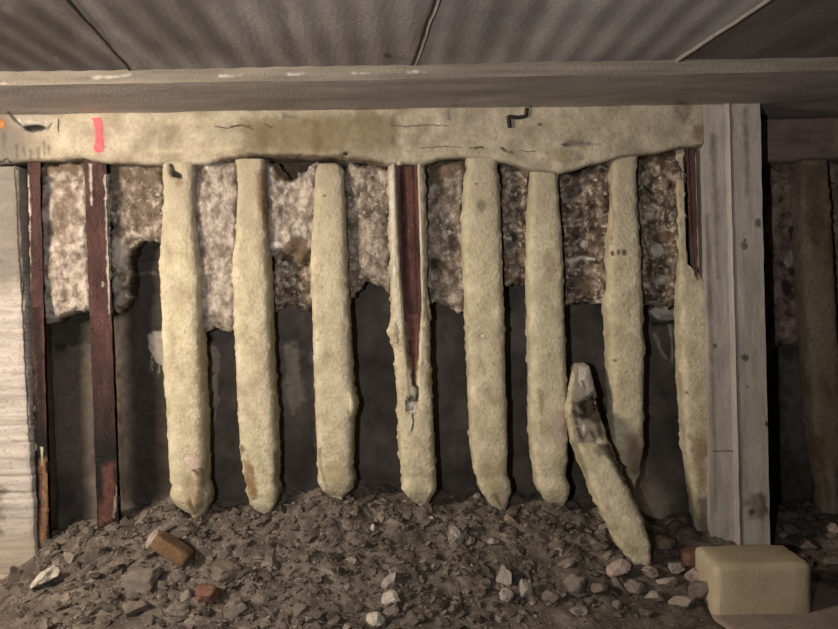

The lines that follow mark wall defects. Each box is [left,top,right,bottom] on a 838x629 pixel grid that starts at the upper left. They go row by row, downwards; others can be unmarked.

crack [0,158,30,443]
spalling [41,162,92,324]
spalling [102,164,182,314]
spalling [196,161,238,332]
spalling [266,159,323,312]
corrosion [406,314,419,388]
spalling [421,159,466,313]
spalling [558,163,626,306]
spalling [636,150,688,325]
spalling [756,164,797,355]
corrosion [35,446,50,547]
corrosion [98,463,117,525]